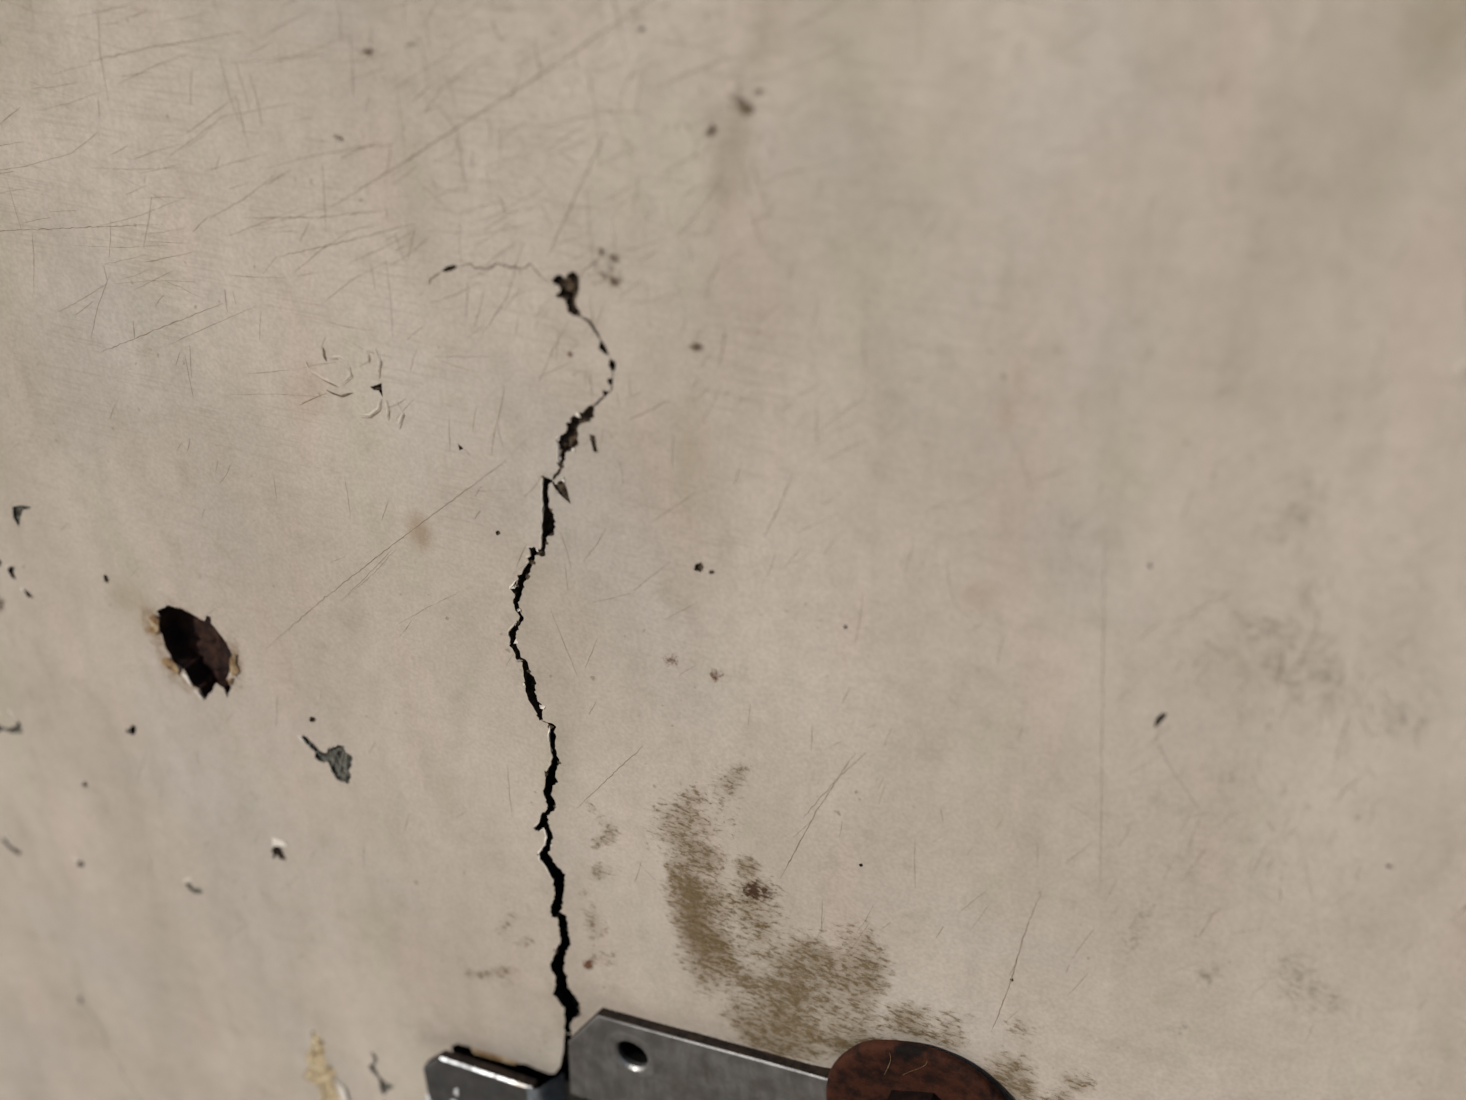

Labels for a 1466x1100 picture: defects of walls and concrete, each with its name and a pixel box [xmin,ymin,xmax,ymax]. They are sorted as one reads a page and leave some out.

peeling [147,615,159,634]
crack [429,258,616,1034]
peeling [162,658,204,700]
peeling [227,654,240,685]
peeling [298,716,352,784]
leakage [656,786,964,1061]
leakage [985,1056,1093,1100]